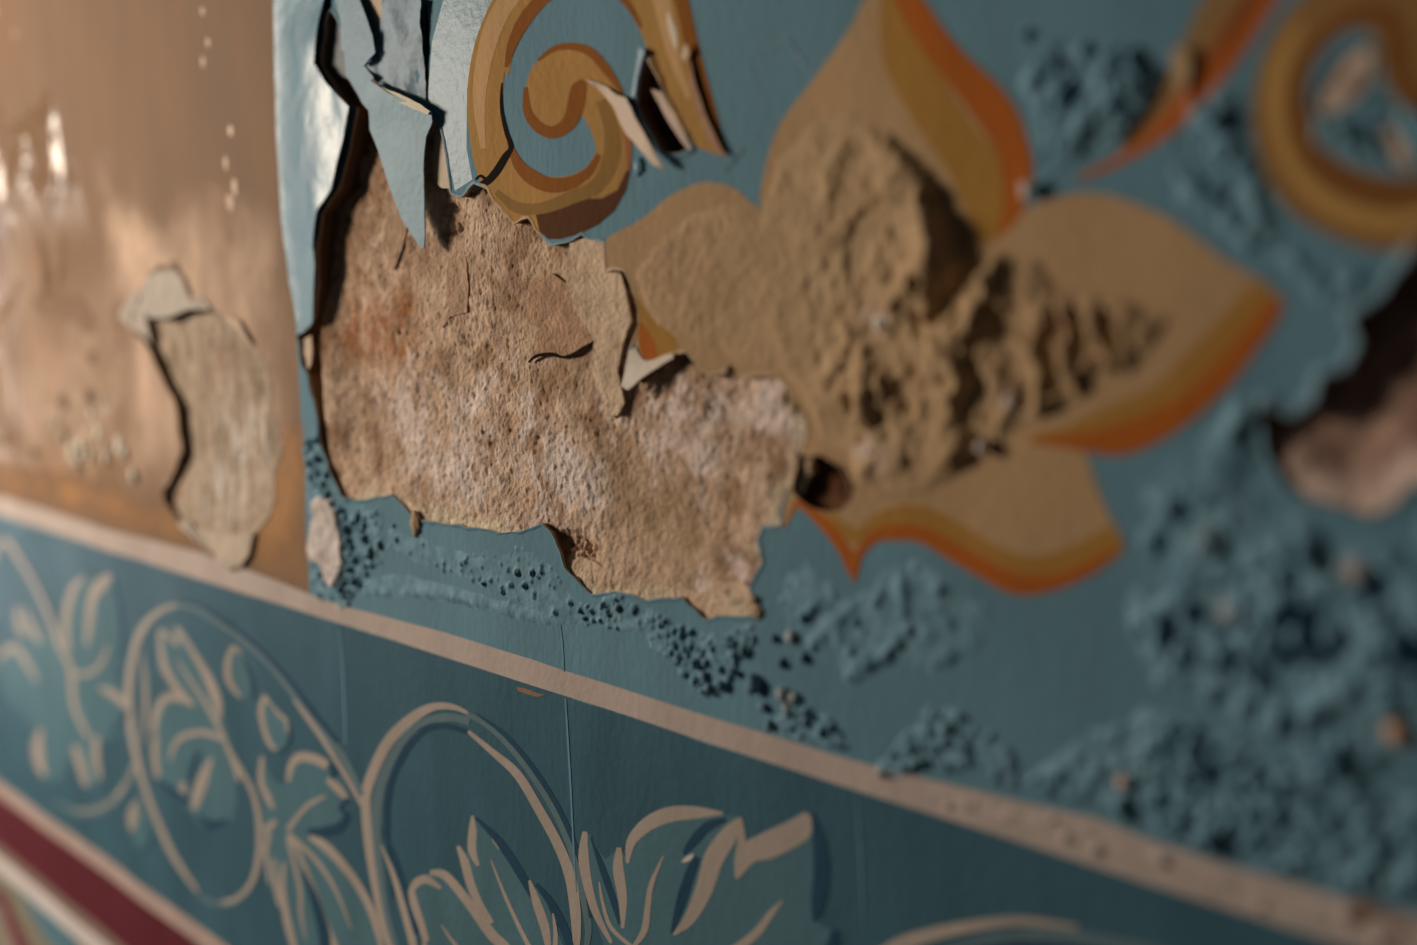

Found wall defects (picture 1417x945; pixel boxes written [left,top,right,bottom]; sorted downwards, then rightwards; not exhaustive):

spalling [118,0,854,623]
spalling [1254,231,1417,523]